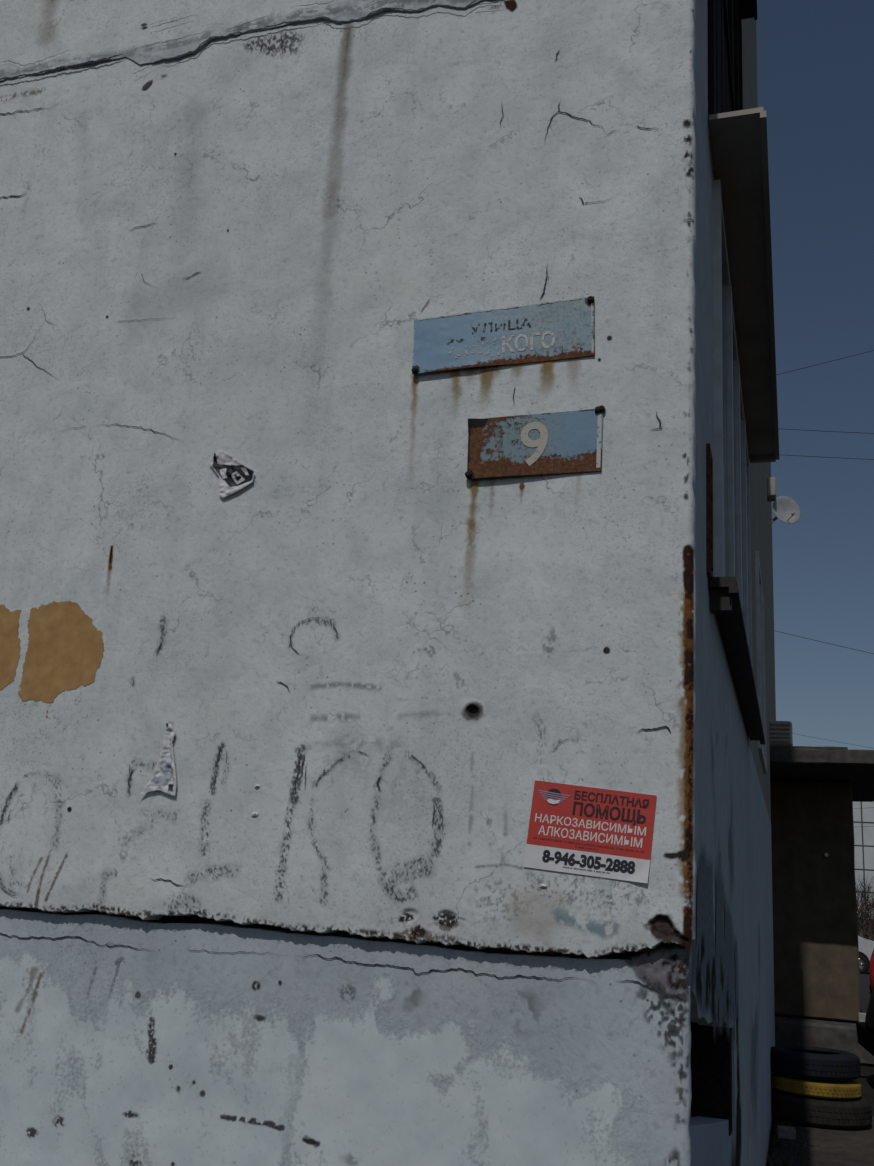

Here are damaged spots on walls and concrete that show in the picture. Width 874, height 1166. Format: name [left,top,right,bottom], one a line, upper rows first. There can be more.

crack [544,102,660,146]
crack [0,307,63,380]
rust [680,545,694,946]
crack [0,933,155,952]
crack [188,949,684,1000]
flaking render [603,825,758,1166]